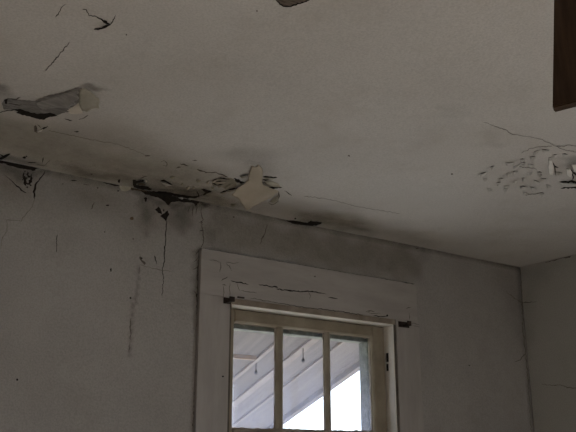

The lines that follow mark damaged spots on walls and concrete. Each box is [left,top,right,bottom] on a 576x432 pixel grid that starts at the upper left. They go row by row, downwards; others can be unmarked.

crack [83,9,115,30]
peeling [0,87,100,133]
leakage [0,154,49,188]
flaking render [97,176,151,192]
peeling [182,169,248,195]
peeling [496,149,576,196]
crack [1,172,45,245]
leakage [131,188,211,221]
leakage [275,217,322,226]
crack [143,221,171,294]
crack [232,281,388,317]